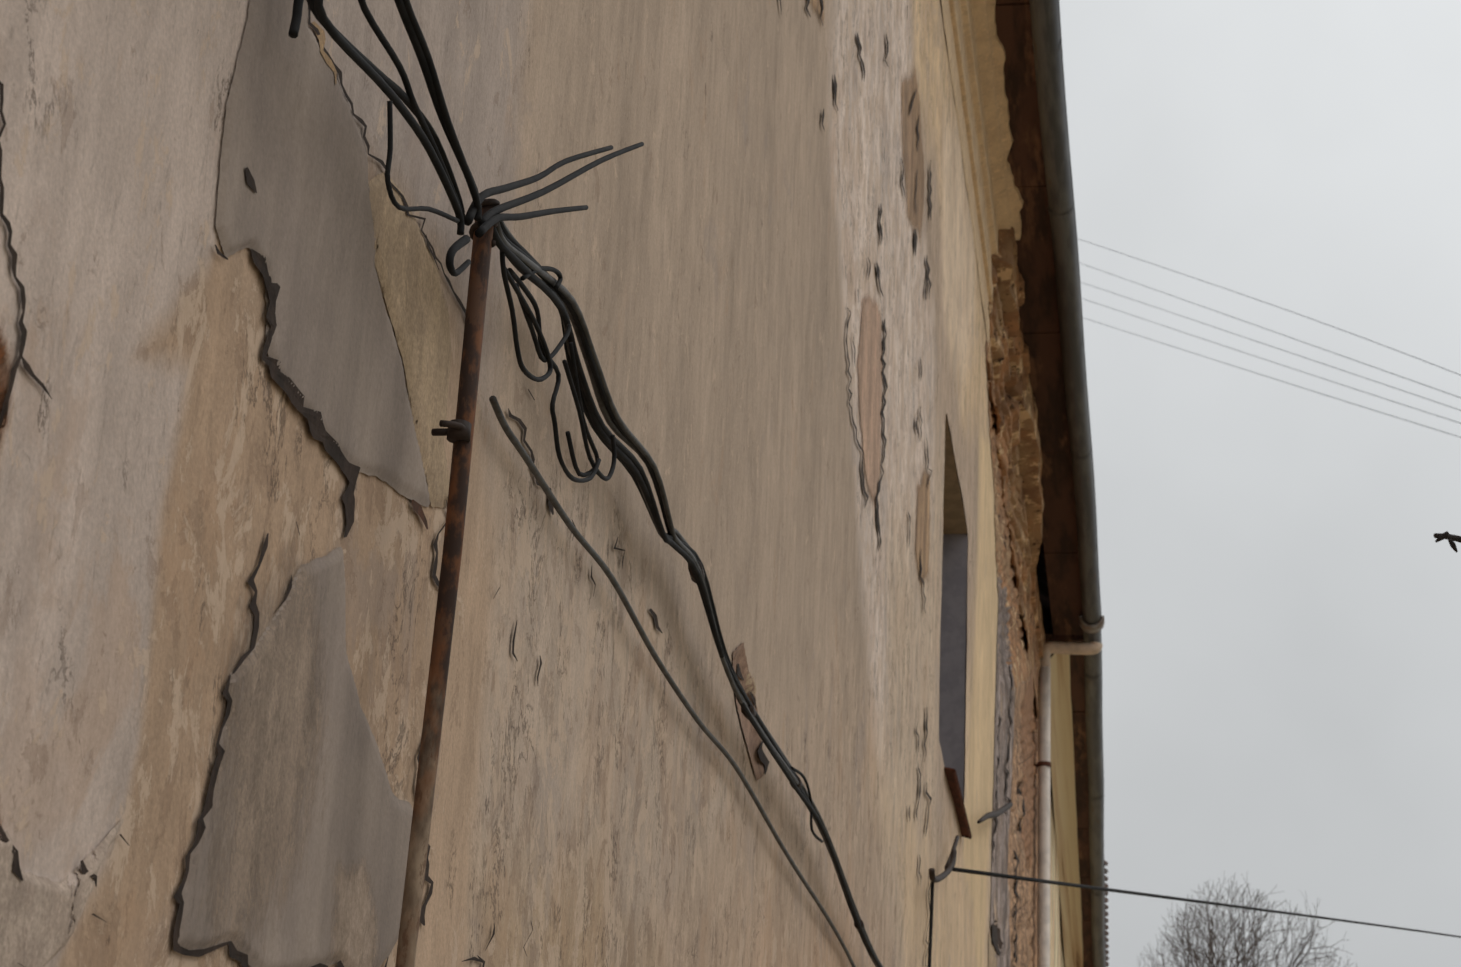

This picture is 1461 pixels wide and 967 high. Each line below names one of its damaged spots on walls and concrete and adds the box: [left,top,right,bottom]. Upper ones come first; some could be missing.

peeling [806,0,825,24]
peeling [245,167,257,193]
peeling [901,71,932,300]
peeling [368,172,451,529]
peeling [846,205,888,551]
peeling [908,406,932,613]
flaking render [985,227,1045,967]
peeling [908,707,932,837]
peeling [0,819,130,967]